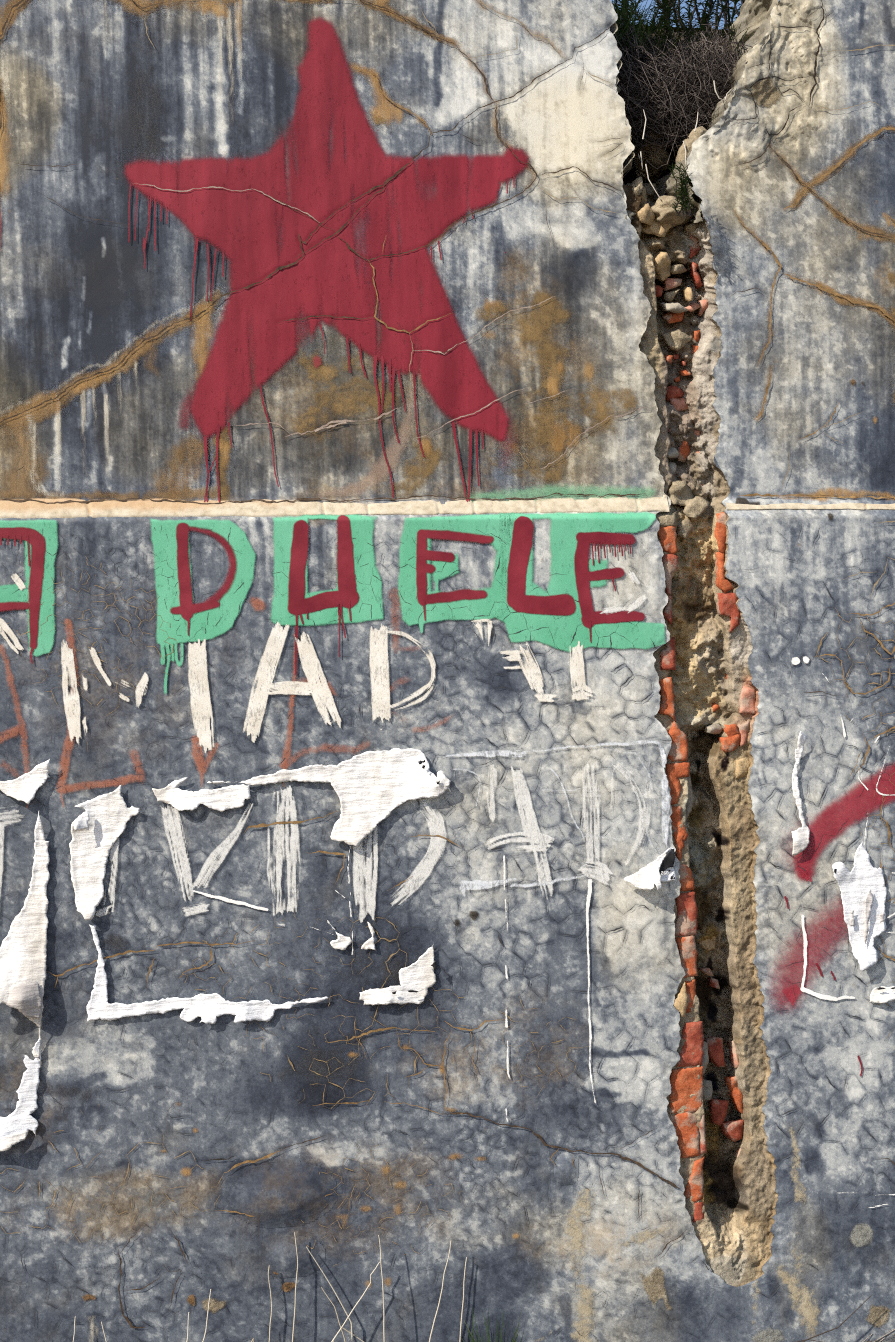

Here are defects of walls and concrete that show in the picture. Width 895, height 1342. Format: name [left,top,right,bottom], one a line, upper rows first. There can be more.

crack [727,0,895,238]
rust [817,282,895,326]
spalling [623,183,778,1287]
crack [0,402,895,1342]
spalling [640,1267,671,1310]